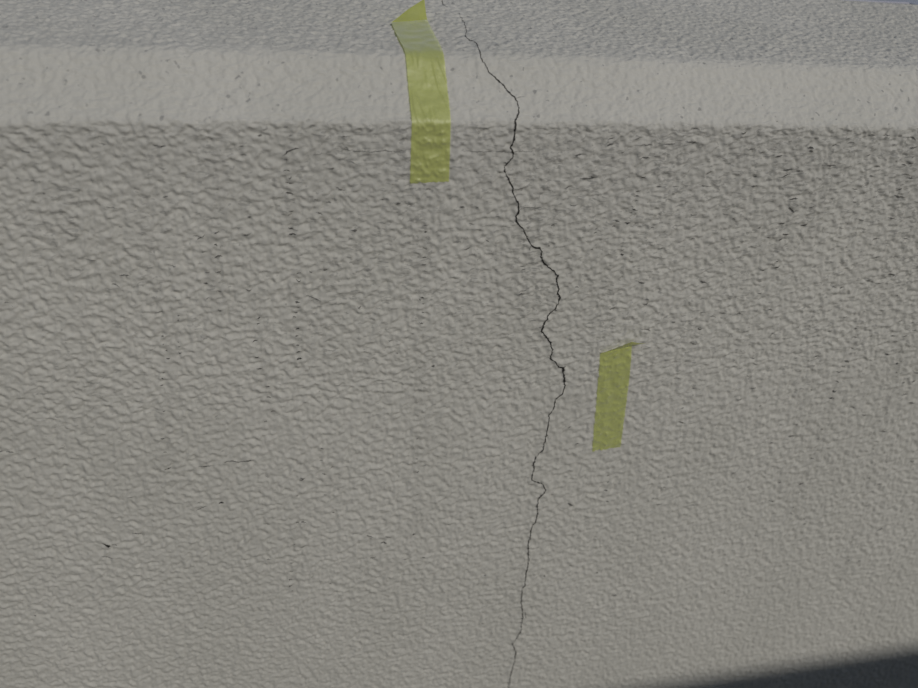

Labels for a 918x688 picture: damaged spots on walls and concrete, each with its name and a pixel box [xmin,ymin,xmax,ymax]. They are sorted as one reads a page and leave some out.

crack [442,2,566,688]